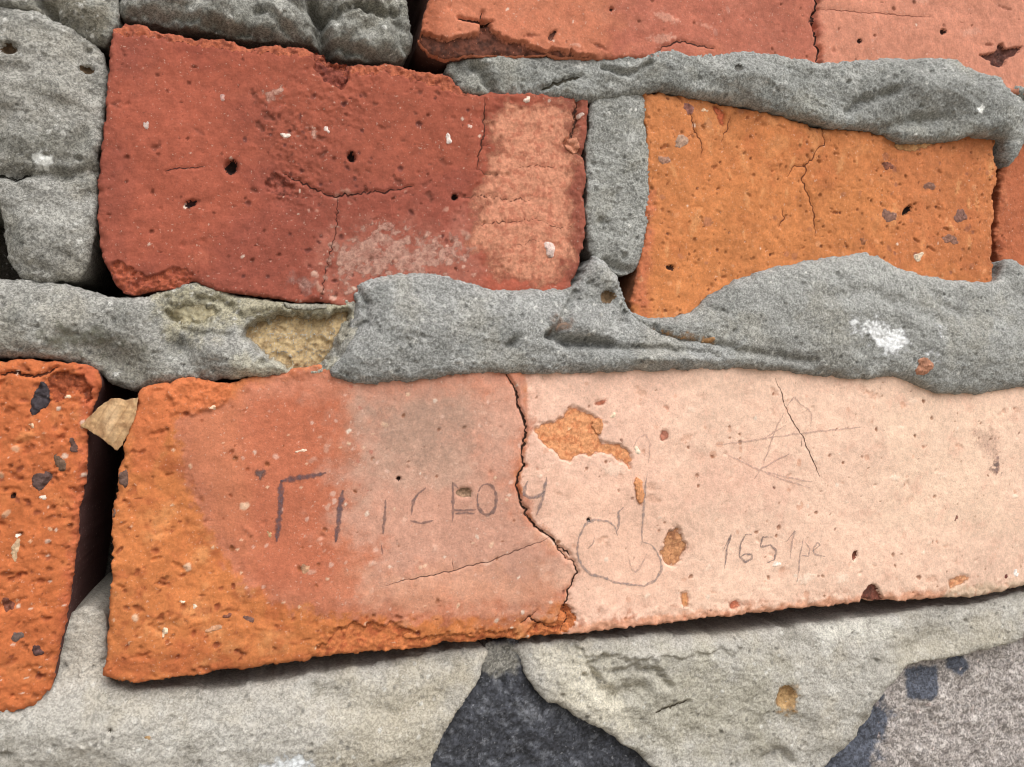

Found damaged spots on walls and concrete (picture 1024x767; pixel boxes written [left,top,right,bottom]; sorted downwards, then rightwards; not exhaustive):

crack [788,130,825,233]
crack [285,174,412,295]
spalling [246,302,350,368]
water stain [850,315,910,355]
spalling [535,400,631,467]
crack [387,374,578,631]
spalling [634,477,645,504]